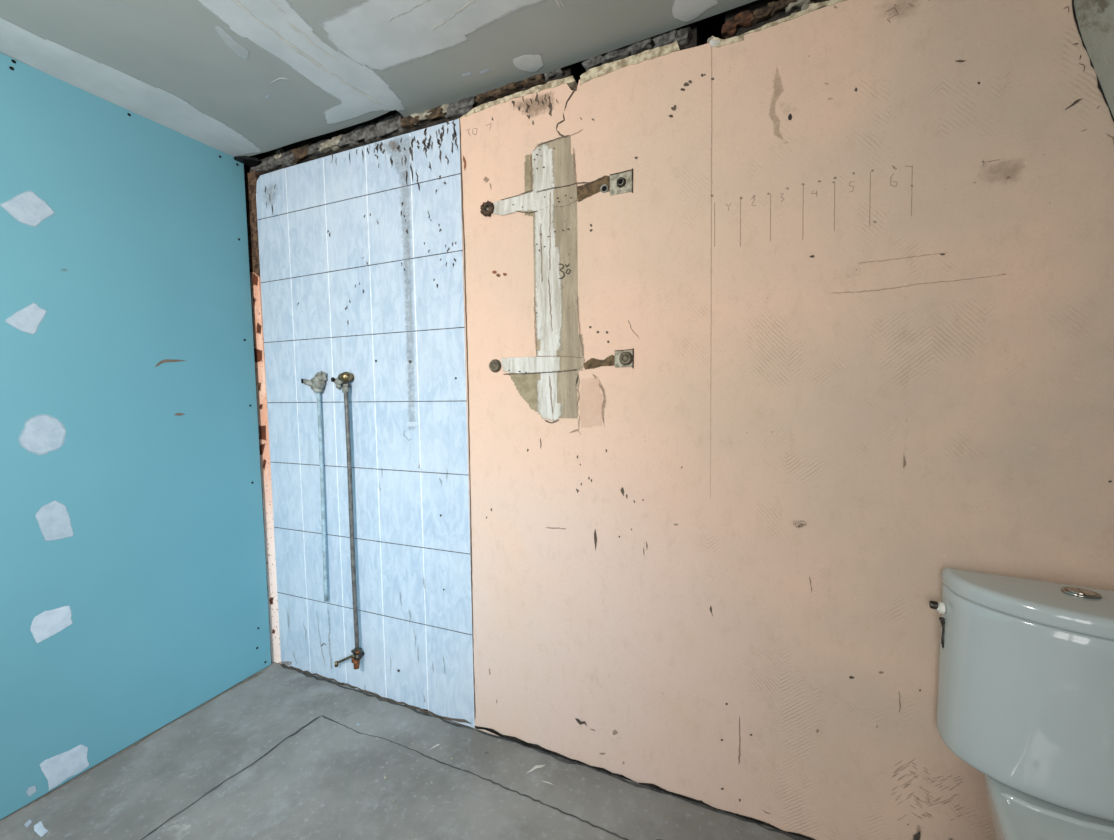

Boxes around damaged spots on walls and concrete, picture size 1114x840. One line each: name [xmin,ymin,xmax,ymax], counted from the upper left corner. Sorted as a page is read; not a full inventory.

spalling [707,0,846,48]
spalling [459,41,680,125]
water stain [331,121,458,195]
crack [501,89,604,213]